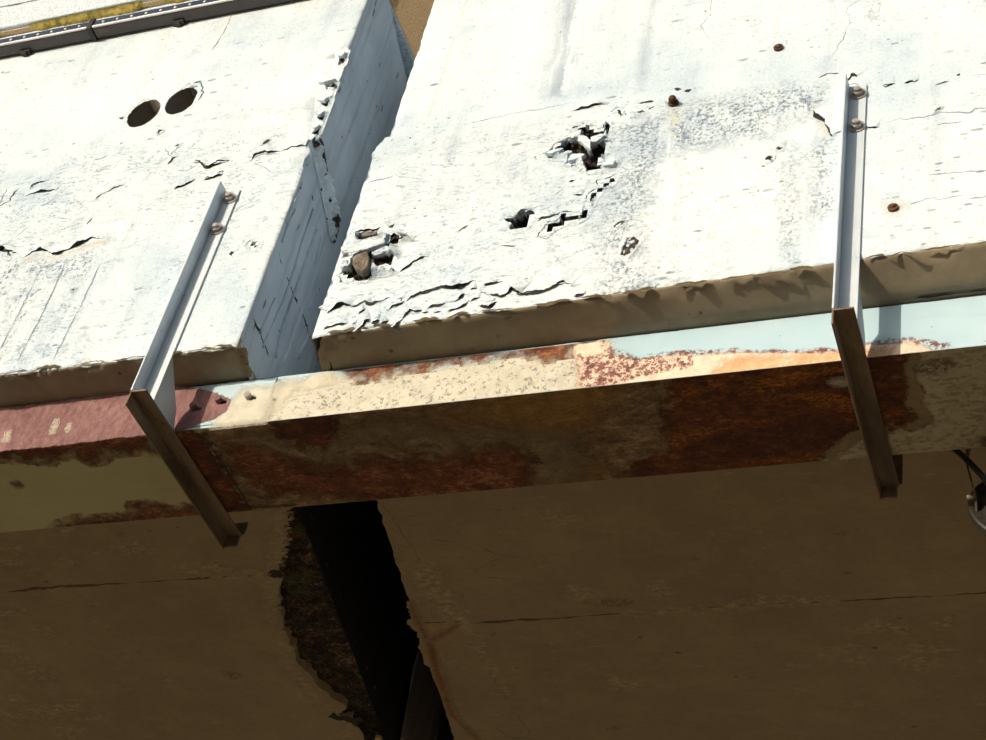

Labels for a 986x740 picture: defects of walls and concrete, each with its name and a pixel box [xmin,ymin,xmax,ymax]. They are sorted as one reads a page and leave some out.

crack [813,0,985,136]
crack [0,155,125,258]
crack [162,137,308,190]
spalling [308,48,841,333]
crack [911,170,986,205]
peeling [0,392,146,452]
peeling [174,385,230,431]
rust [175,338,860,513]
rust [865,337,956,432]
crack [9,570,284,592]
crack [426,613,620,623]
rust [406,601,484,740]